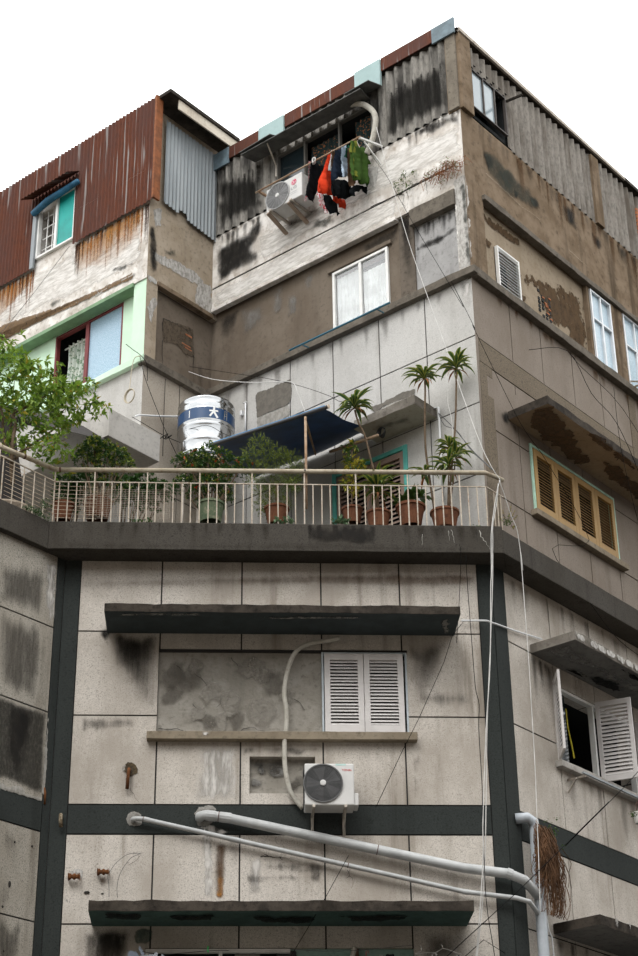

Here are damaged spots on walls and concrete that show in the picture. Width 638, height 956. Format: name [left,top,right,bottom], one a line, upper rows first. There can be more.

water stain [388,64,458,135]
corrosion [0,270,34,306]
corrosion [75,204,149,268]
spalling [162,319,195,356]
water stain [148,208,213,314]
water stain [217,165,260,279]
peeling [484,214,519,248]
peeling [520,274,587,350]
water stain [6,566,56,618]
water stain [0,699,44,789]
water stain [88,935,125,956]